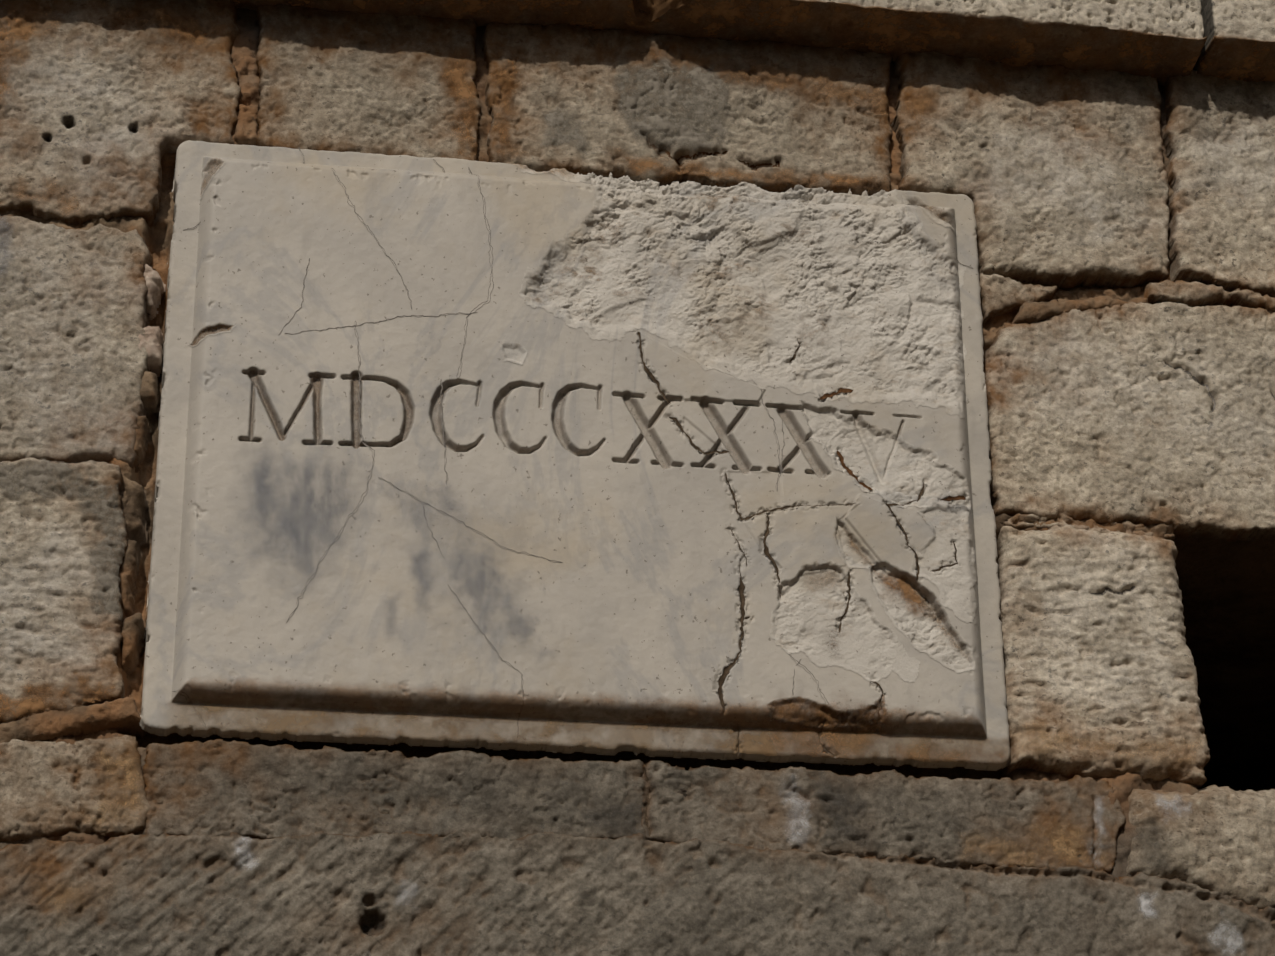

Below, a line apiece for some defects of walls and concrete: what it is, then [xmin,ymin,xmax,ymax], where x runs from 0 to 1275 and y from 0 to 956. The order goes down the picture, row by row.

crack [279,148,563,738]
spalling [513,163,977,735]
crack [637,332,966,756]